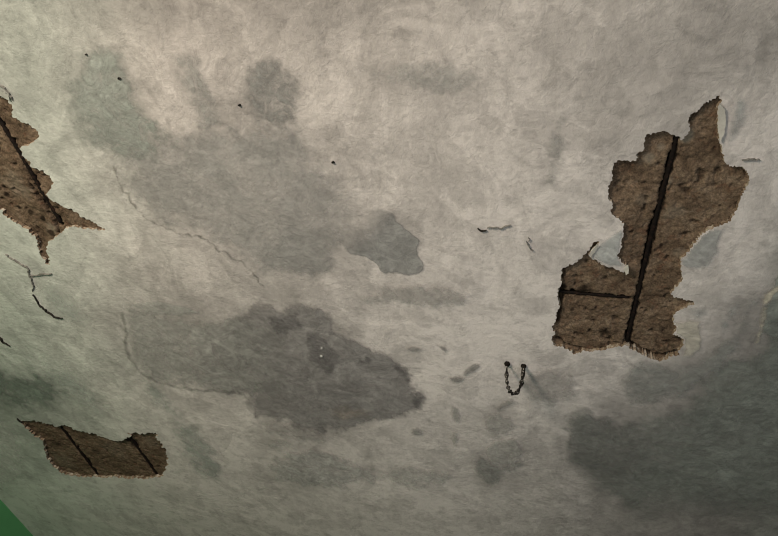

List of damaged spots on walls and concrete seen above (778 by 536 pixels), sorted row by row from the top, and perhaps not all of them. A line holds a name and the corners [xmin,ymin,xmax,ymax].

crack [5,254,62,319]
spalling [0,89,105,264]
spalling [21,420,168,480]
leakage [71,52,334,275]
leakage [124,302,424,439]
spalling [551,96,750,361]
leakage [604,278,778,505]